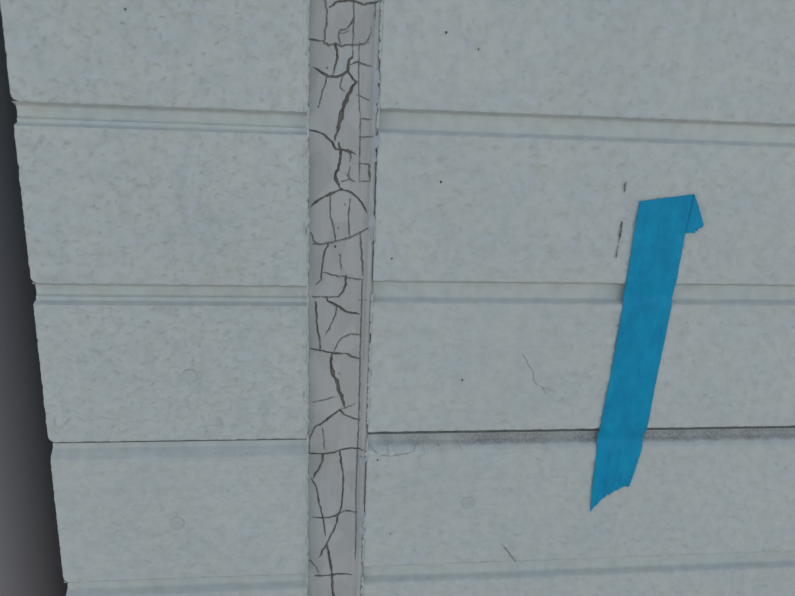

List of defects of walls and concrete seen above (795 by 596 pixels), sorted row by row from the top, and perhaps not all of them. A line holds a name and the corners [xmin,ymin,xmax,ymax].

crack [309,0,462,596]